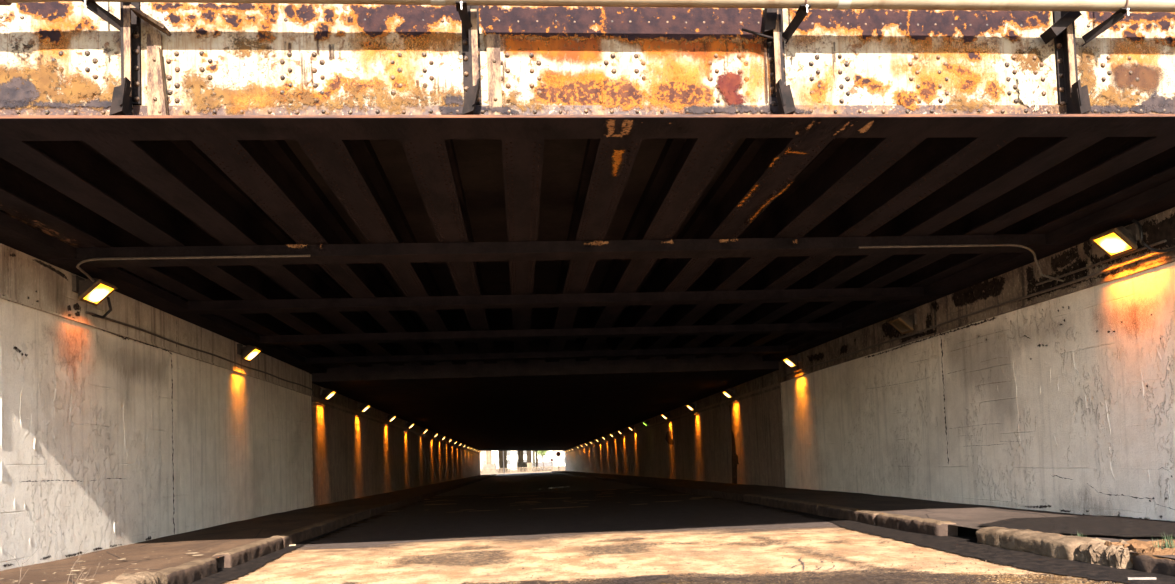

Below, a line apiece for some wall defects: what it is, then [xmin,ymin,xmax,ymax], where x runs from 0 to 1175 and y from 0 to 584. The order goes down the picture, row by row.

corrosion [0,16,136,112]
corrosion [181,13,465,115]
corrosion [500,35,605,111]
corrosion [619,37,768,107]
corrosion [794,28,998,114]
corrosion [1014,47,1043,73]
corrosion [1076,43,1150,108]
corrosion [1112,40,1159,69]
corrosion [611,150,625,176]
crack [865,257,1175,462]
crack [56,312,175,534]
crack [22,476,122,484]